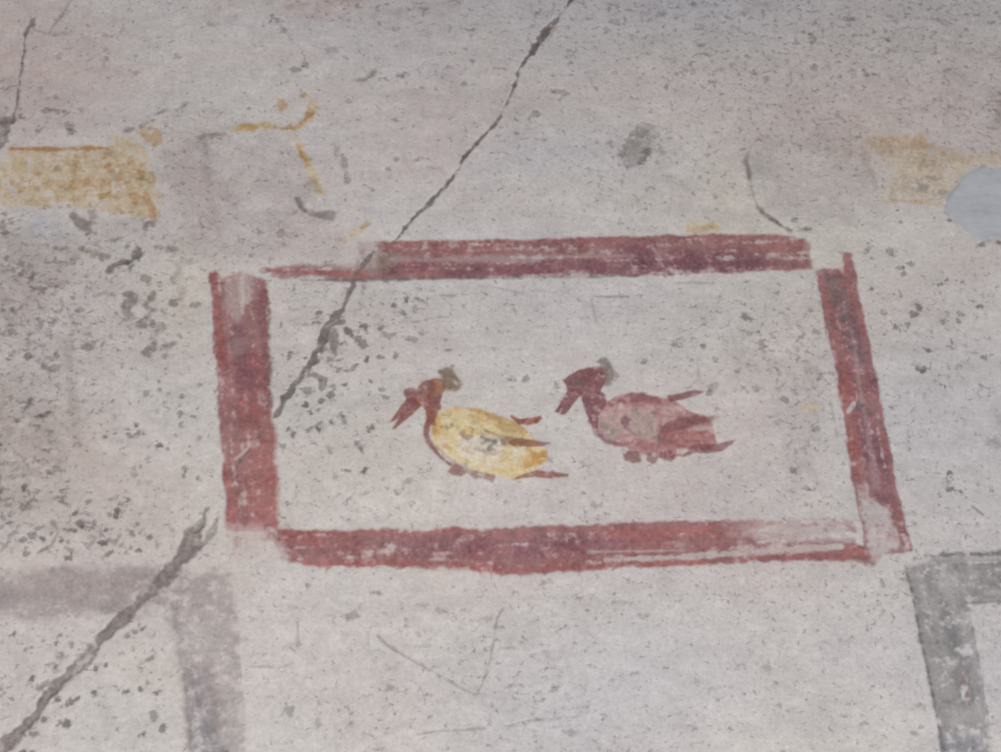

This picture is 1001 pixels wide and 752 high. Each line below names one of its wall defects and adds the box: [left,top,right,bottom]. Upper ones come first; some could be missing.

crack [3,0,75,124]
crack [226,0,576,477]
crack [0,504,221,752]